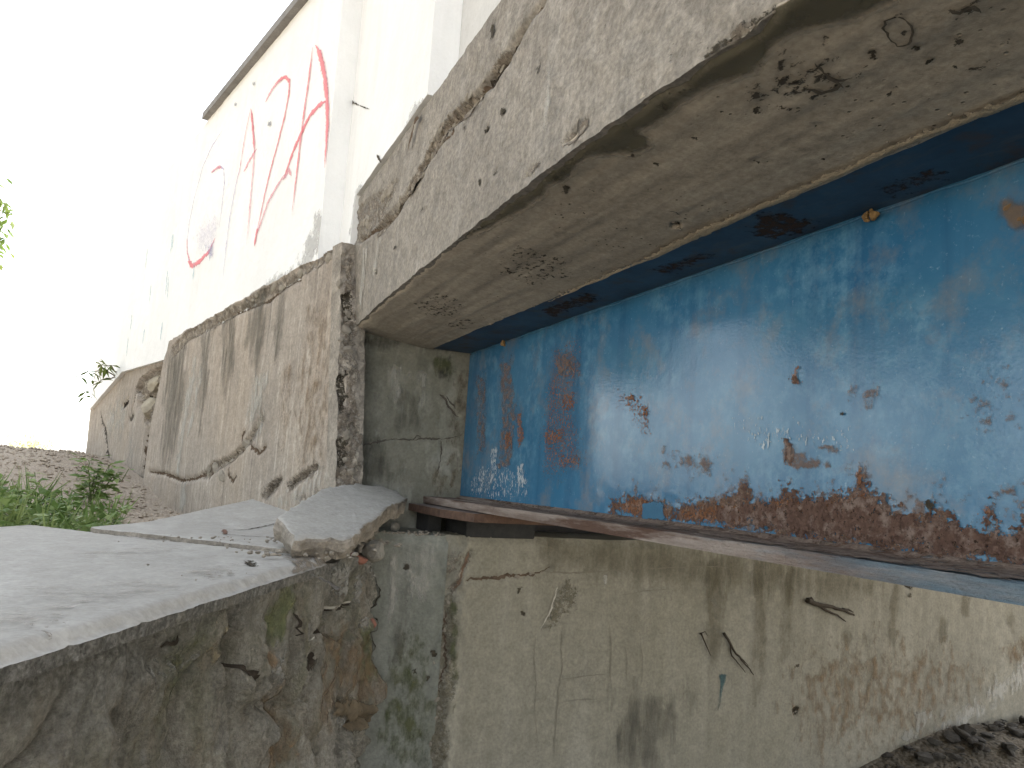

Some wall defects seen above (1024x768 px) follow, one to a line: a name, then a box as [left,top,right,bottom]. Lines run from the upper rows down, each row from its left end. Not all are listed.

crack [364,7,543,240]
corrosion [1002,200,1024,227]
spalling [135,167,425,487]
crack [101,392,267,483]
corrosion [497,355,524,468]
corrosion [536,340,588,482]
corrosion [616,388,653,434]
corrosion [662,445,712,476]
corrosion [782,438,838,470]
corrosion [492,467,1024,580]
crack [466,566,728,581]